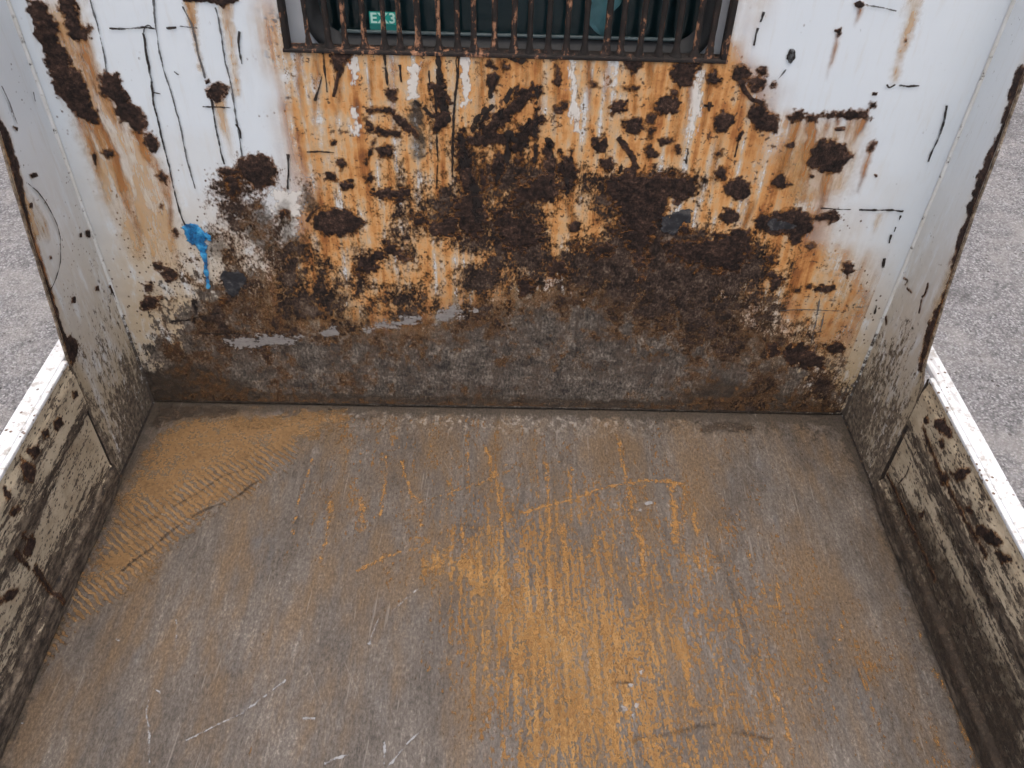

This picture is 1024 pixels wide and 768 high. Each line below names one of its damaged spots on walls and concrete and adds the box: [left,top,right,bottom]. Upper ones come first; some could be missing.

corrosion [52,12,174,257]
corrosion [183,0,239,27]
corrosion [266,17,878,345]
corrosion [44,406,980,768]